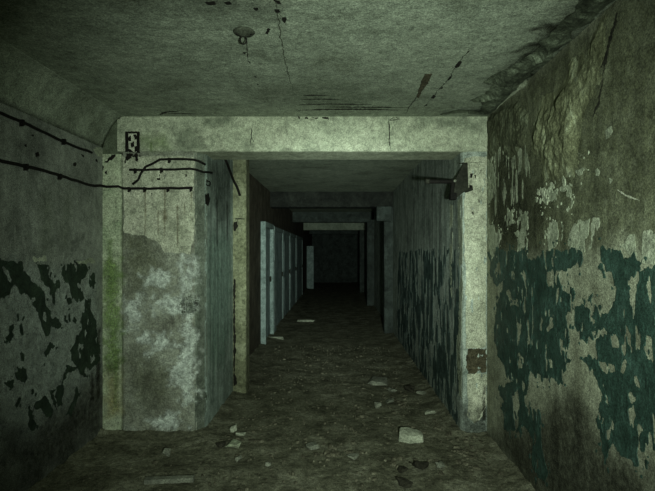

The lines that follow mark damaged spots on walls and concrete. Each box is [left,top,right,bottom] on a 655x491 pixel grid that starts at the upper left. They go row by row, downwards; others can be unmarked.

crack [275,2,470,149]
peeling [440,69,527,115]
crack [592,12,618,118]
peeling [0,255,101,431]
water stain [124,293,142,322]
water stain [136,253,201,405]
peeling [397,147,655,487]
water stain [147,412,180,430]